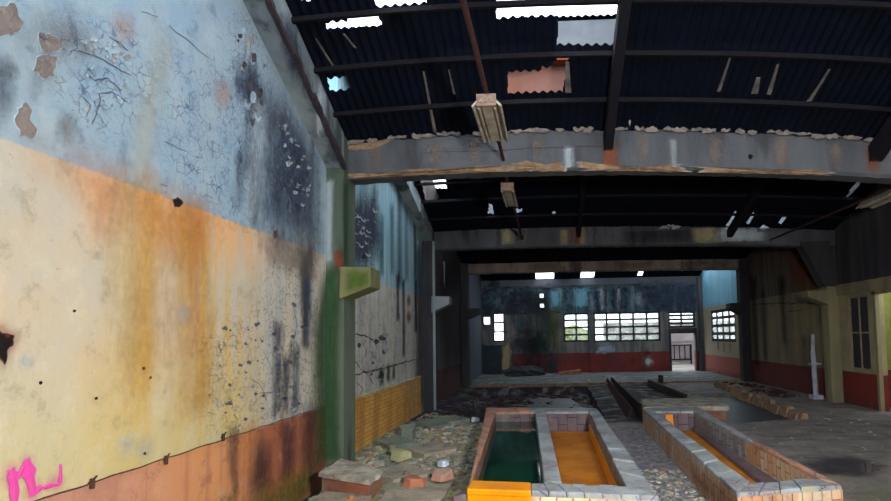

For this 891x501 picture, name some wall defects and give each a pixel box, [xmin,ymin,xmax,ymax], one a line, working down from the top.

flaking render [0,1,24,37]
flaking render [13,101,38,140]
flaking render [32,31,64,80]
crack [74,36,130,124]
peeling [237,27,257,71]
peeling [244,80,263,127]
peeling [279,124,311,170]
damp [237,65,317,347]
crack [251,304,304,402]
damp [274,325,298,415]